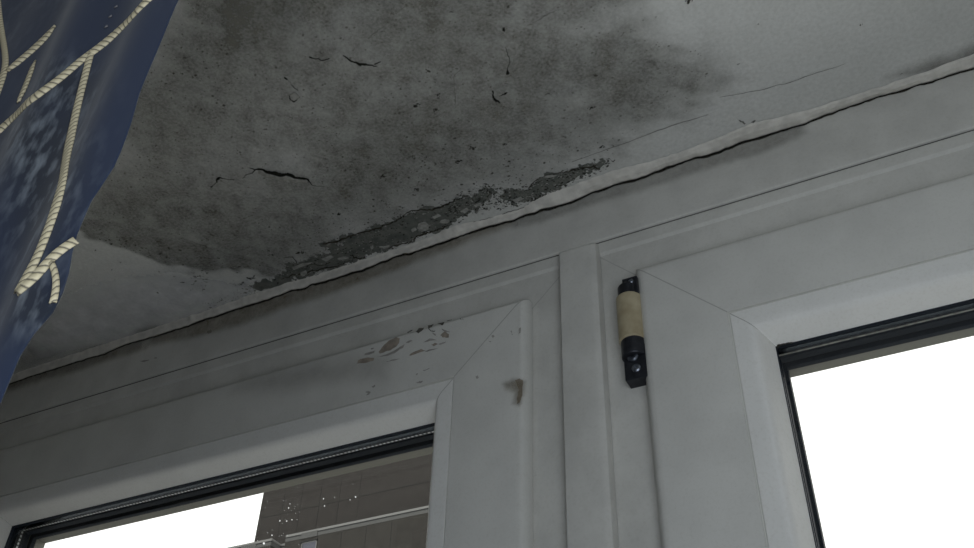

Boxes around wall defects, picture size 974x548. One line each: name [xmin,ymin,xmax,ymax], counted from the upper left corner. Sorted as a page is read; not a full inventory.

crack [309,55,381,67]
leakage [81,0,696,335]
spalling [252,158,611,291]
crack [9,68,974,385]